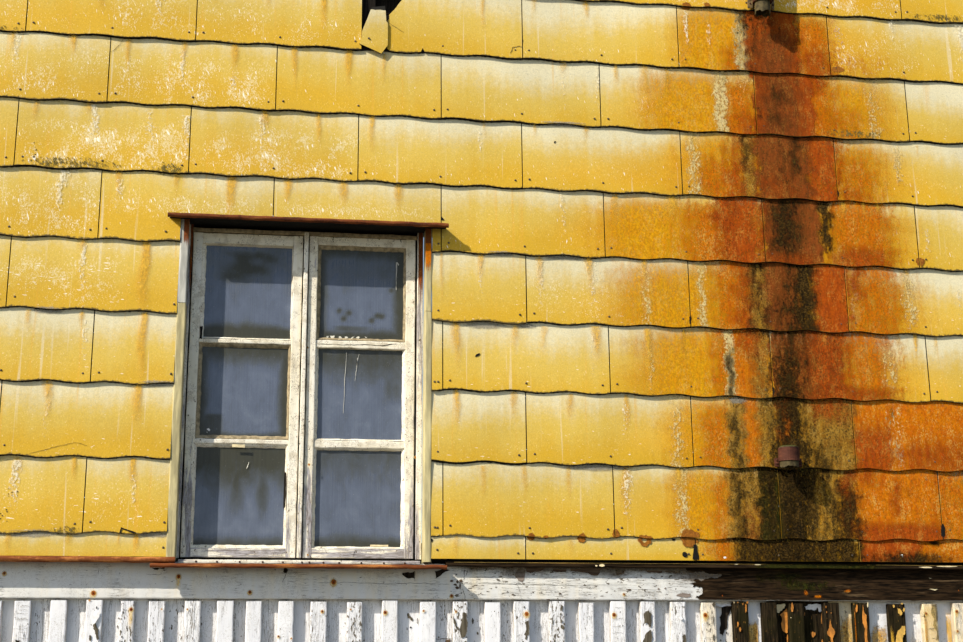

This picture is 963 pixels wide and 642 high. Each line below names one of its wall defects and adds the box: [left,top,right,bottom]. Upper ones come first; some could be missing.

damp [711,10,768,132]
damp [863,79,884,140]
damp [685,132,703,194]
damp [740,135,757,197]
damp [696,262,708,326]
corrosion [606,10,963,562]
damp [723,199,953,562]
damp [668,395,690,537]
peeling [435,562,605,589]
peeling [616,563,963,642]